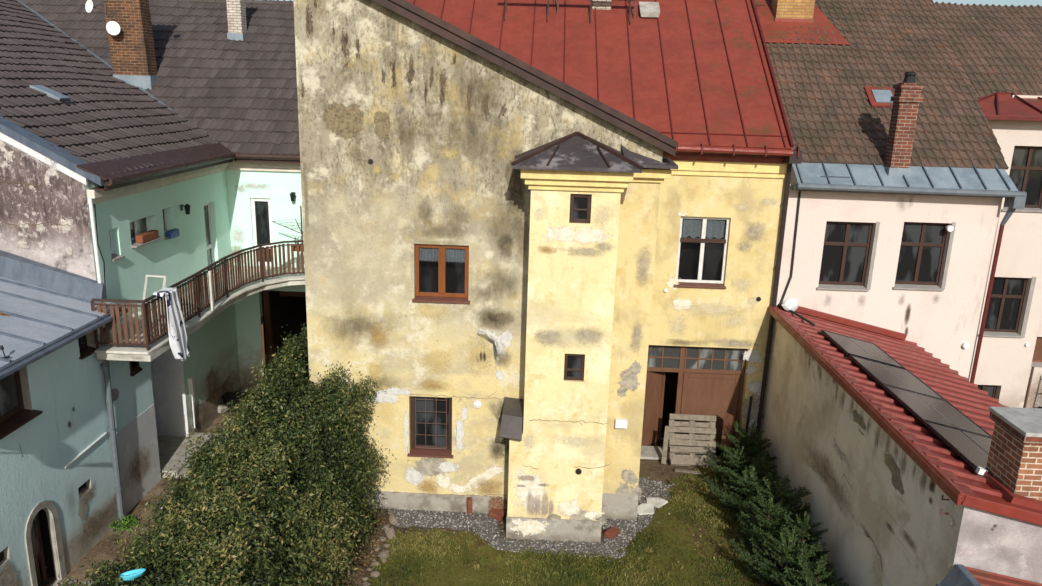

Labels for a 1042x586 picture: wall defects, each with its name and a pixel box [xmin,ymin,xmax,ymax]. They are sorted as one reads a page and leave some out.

leakage [306,0,317,44]
leakage [332,21,360,72]
leakage [381,53,456,108]
leakage [467,83,508,119]
leakage [495,169,524,253]
peeling [542,211,612,246]
leakage [480,312,508,327]
peeling [472,328,513,380]
peeling [617,361,642,397]
spalling [364,387,503,495]
leakage [806,352,935,503]
peeling [488,469,605,537]